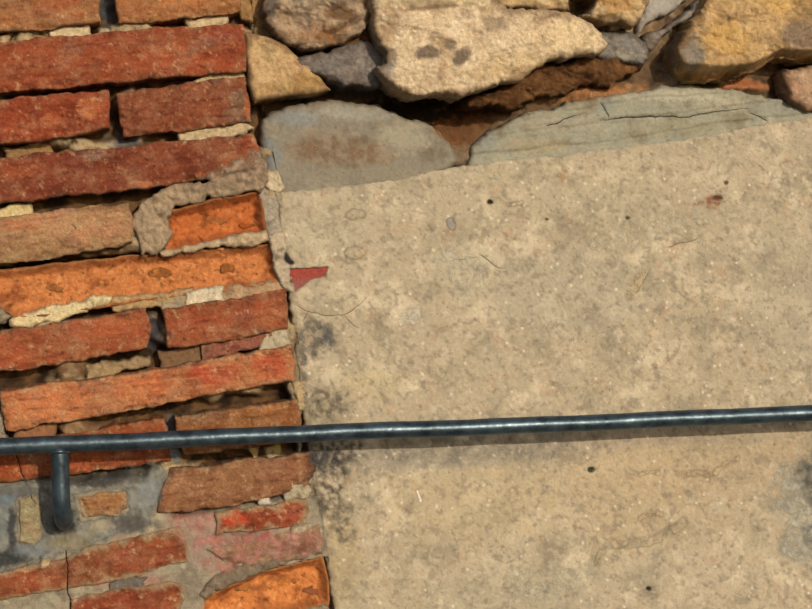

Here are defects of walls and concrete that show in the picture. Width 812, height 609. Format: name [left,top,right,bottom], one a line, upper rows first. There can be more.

crack [600,102,767,121]
spalling [0,191,279,317]
flaking render [284,253,328,294]
crack [64,550,72,609]
spalling [203,557,330,609]